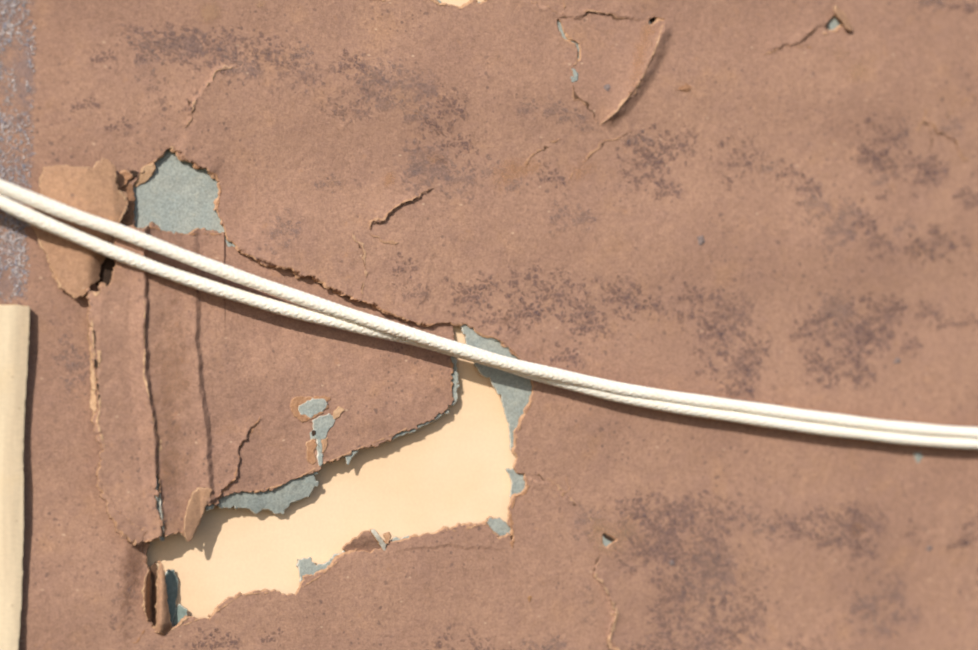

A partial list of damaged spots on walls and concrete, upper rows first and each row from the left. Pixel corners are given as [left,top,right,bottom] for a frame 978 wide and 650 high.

peeling [431,0,485,9]
crack [532,0,664,184]
crack [763,5,853,55]
peeling [33,146,519,360]
peeling [30,224,533,643]
crack [532,473,620,650]